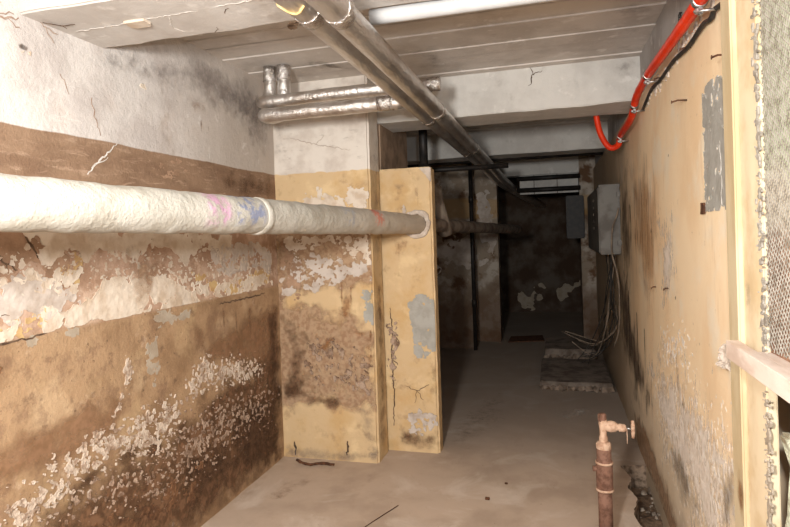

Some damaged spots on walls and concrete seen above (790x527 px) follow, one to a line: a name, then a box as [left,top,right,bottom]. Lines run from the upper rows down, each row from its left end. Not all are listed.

crack [0,11,20,28]
crack [87,97,117,174]
flaking render [702,75,726,212]
peeling [303,184,369,208]
peeling [0,232,374,387]
leakage [0,234,383,527]
flaking render [386,321,400,387]
peeling [407,294,436,359]
peeling [407,409,438,436]
peeling [517,283,546,311]
peeling [556,280,580,301]
leakage [620,284,734,527]